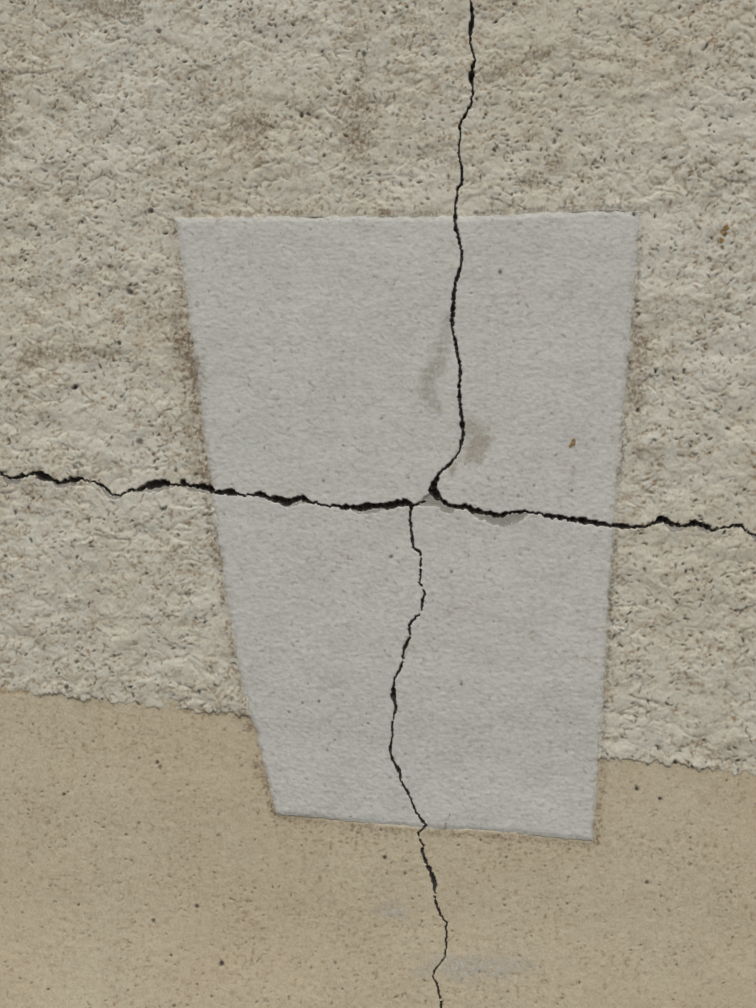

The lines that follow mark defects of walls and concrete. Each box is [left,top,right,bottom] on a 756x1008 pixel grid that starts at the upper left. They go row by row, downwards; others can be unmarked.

crack [0,1,756,611]
crack [389,615,447,1008]